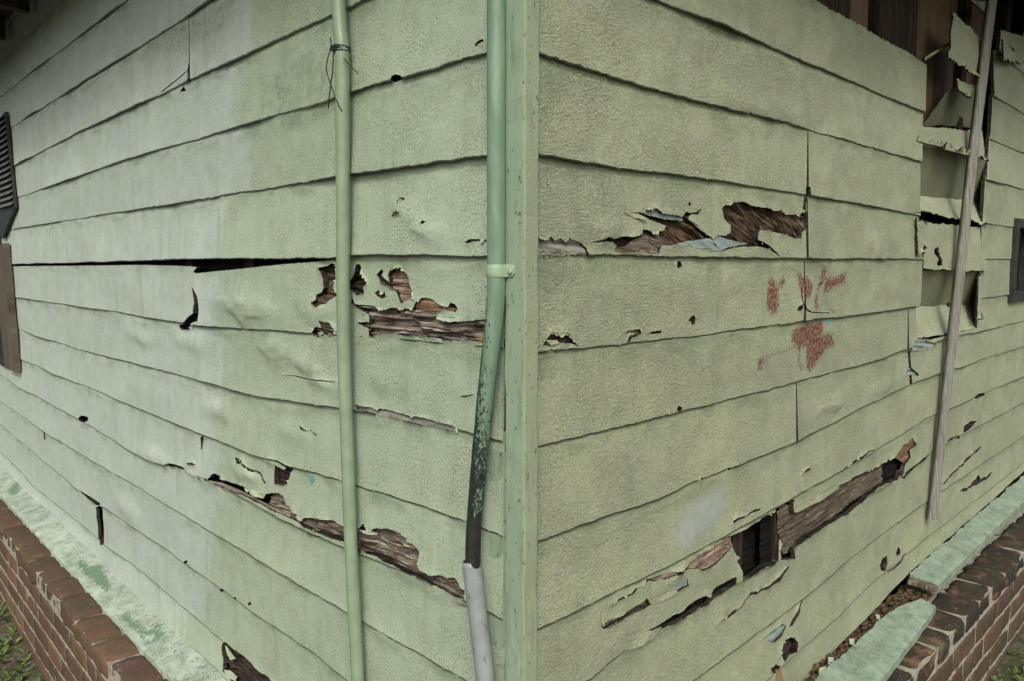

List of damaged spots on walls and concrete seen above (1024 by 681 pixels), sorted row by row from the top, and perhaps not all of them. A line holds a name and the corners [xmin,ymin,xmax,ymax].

spalling [595,202,806,255]
spalling [310,259,336,307]
spalling [350,264,485,341]
spalling [308,321,334,338]
spalling [262,458,293,487]
peeling [601,484,865,652]
peeling [223,645,237,681]